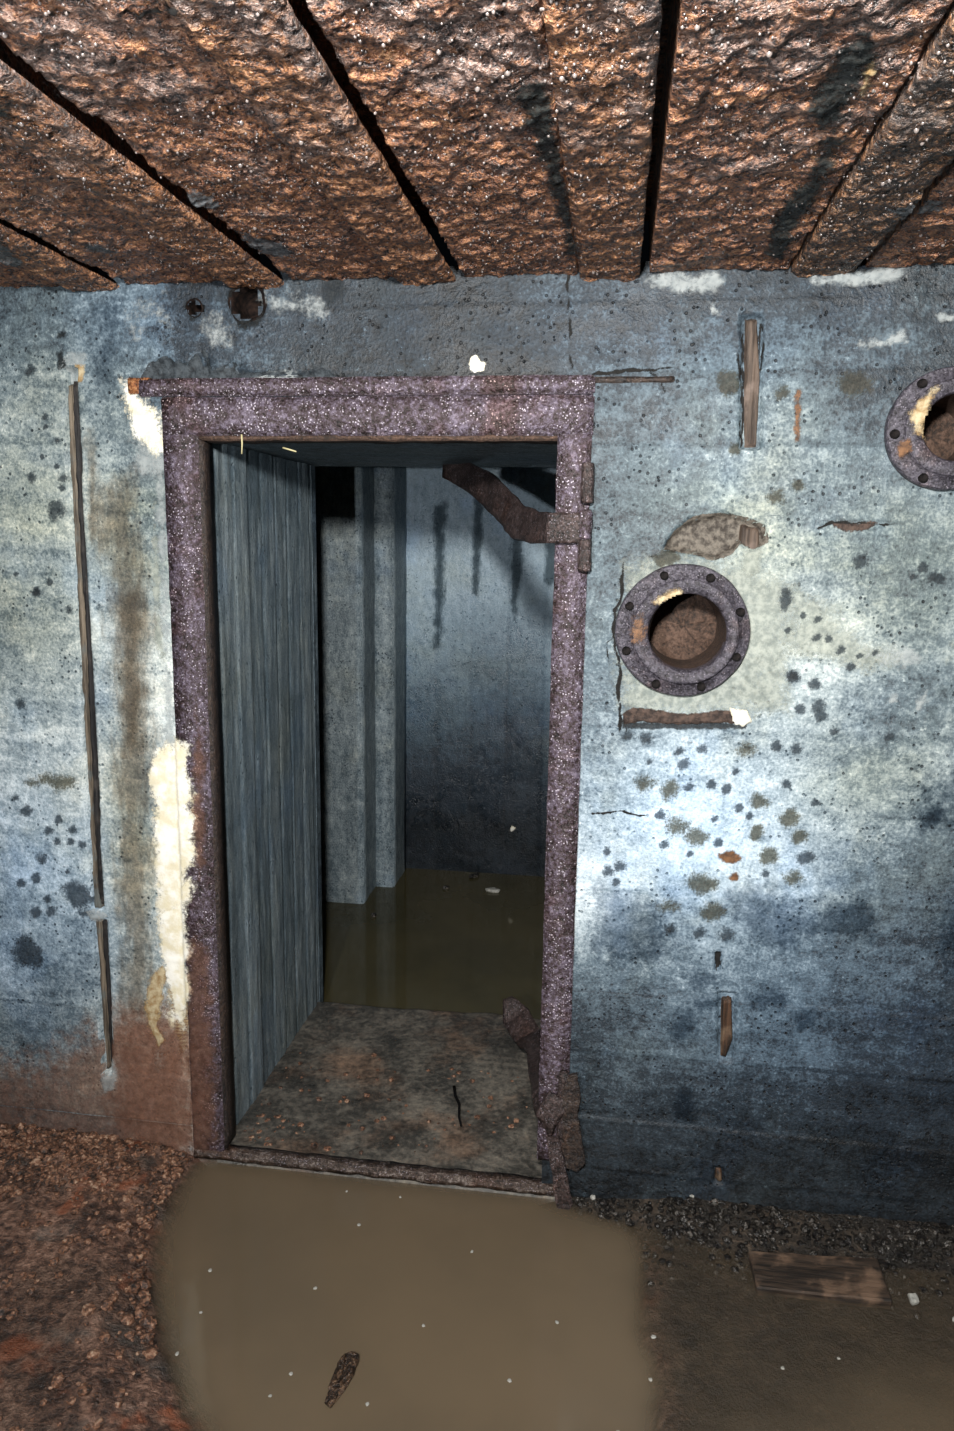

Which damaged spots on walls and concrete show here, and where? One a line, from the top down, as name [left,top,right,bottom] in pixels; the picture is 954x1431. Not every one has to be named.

spalling [119,349,336,458]
damp [910,562,945,584]
rust [622,707,752,730]
damp [779,587,888,735]
peeling [148,739,199,1052]
damp [591,847,682,966]
damp [622,730,874,950]
damp [920,771,954,831]